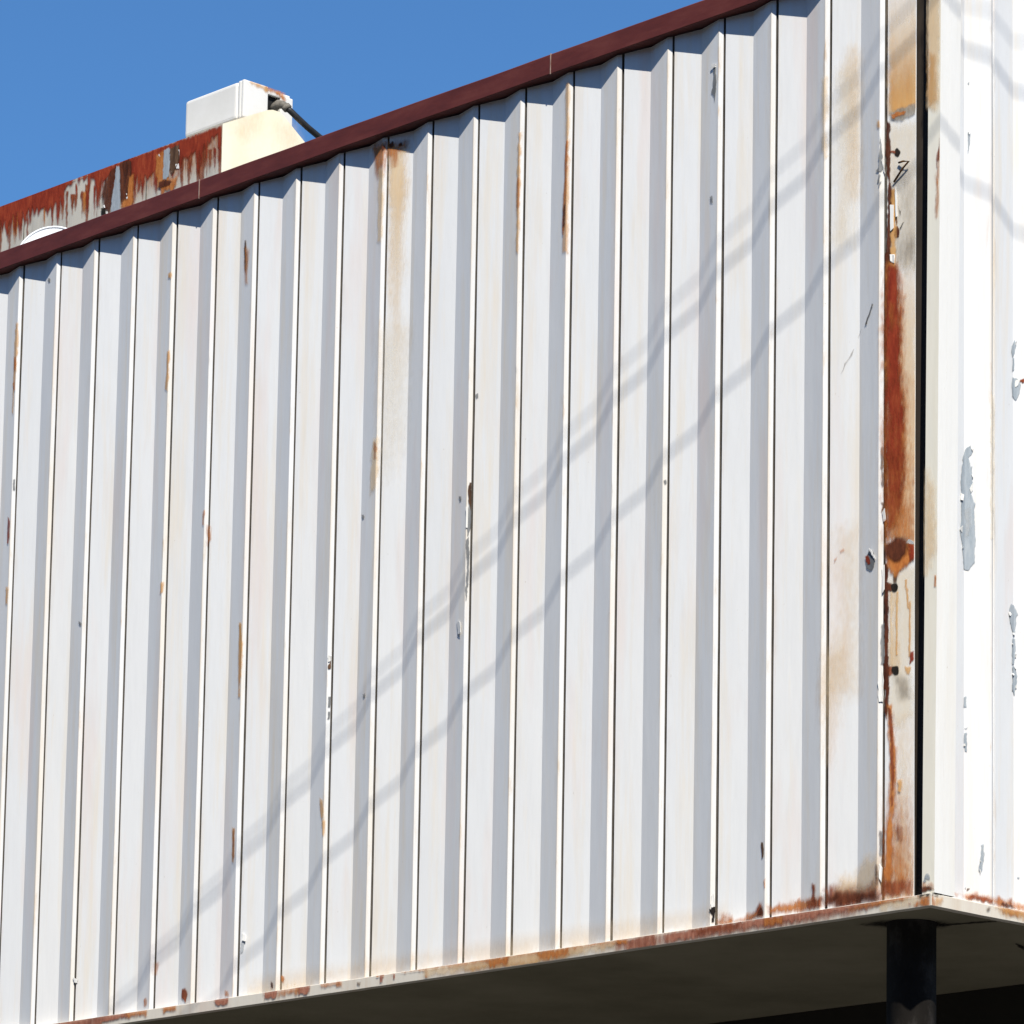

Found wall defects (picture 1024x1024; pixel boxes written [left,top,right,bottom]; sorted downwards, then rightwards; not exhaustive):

corrosion [0,126,222,249]
corrosion [373,141,405,249]
corrosion [883,263,915,593]
peeling [1011,340,1024,400]
peeling [960,444,976,570]
peeling [1009,604,1018,695]
corrosion [414,705,938,977]
corrosion [966,894,1024,918]